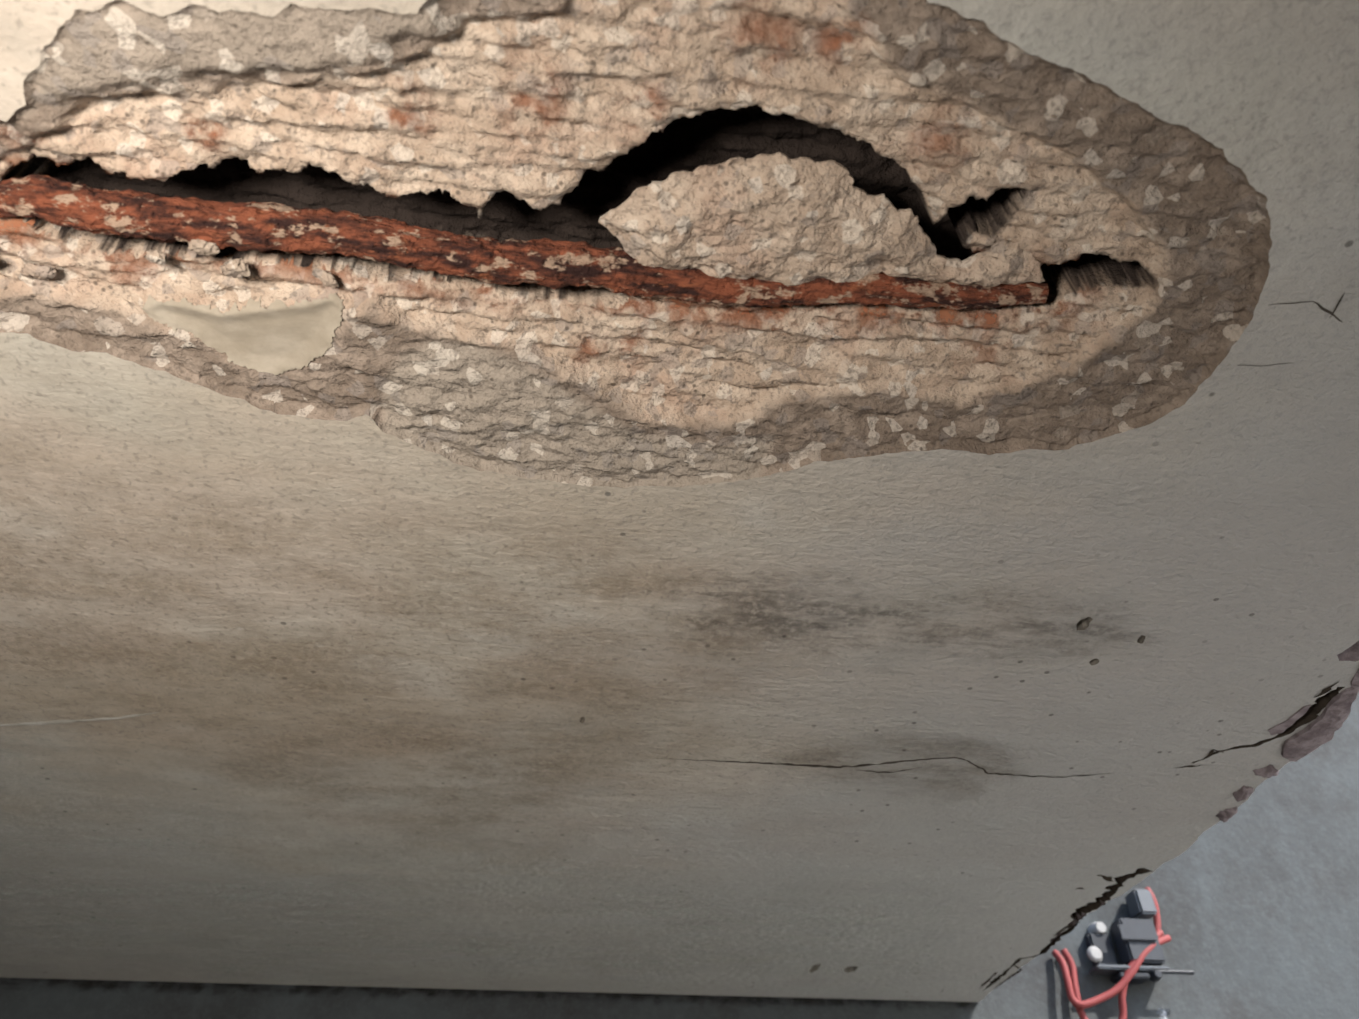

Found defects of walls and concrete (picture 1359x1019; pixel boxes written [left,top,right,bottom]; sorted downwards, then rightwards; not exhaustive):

spalling [0,0,1272,488]
spalling [1337,630,1359,701]
crack [661,757,1110,778]
crack [1178,682,1354,768]
crack [979,868,1154,990]